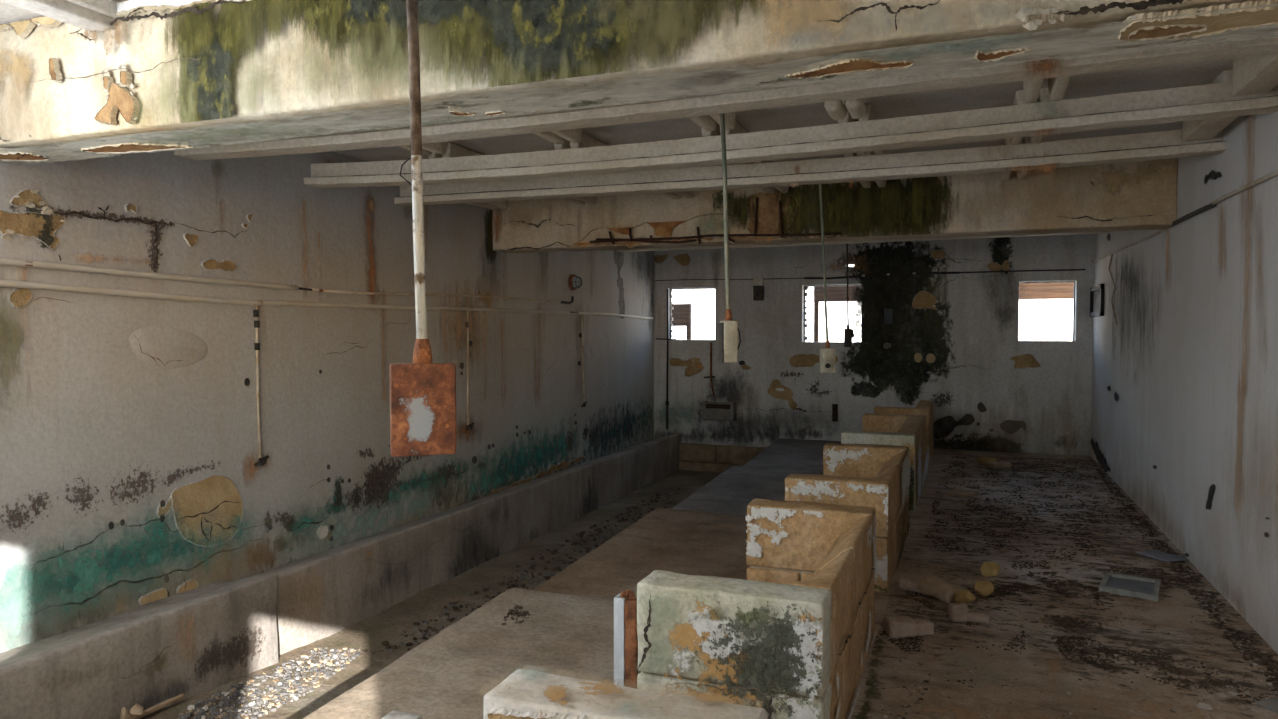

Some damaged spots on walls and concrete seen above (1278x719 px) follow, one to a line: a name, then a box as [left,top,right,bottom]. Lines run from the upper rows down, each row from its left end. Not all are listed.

water stain [175,5,241,123]
water stain [298,0,693,88]
peeling [0,0,1278,165]
crack [814,0,940,30]
peeling [0,189,66,251]
crack [53,205,248,267]
water stain [779,176,954,407]
water stain [0,383,822,645]
peeling [745,401,1027,581]
crack [637,594,652,672]
peeling [487,678,623,719]
crack [669,683,811,719]